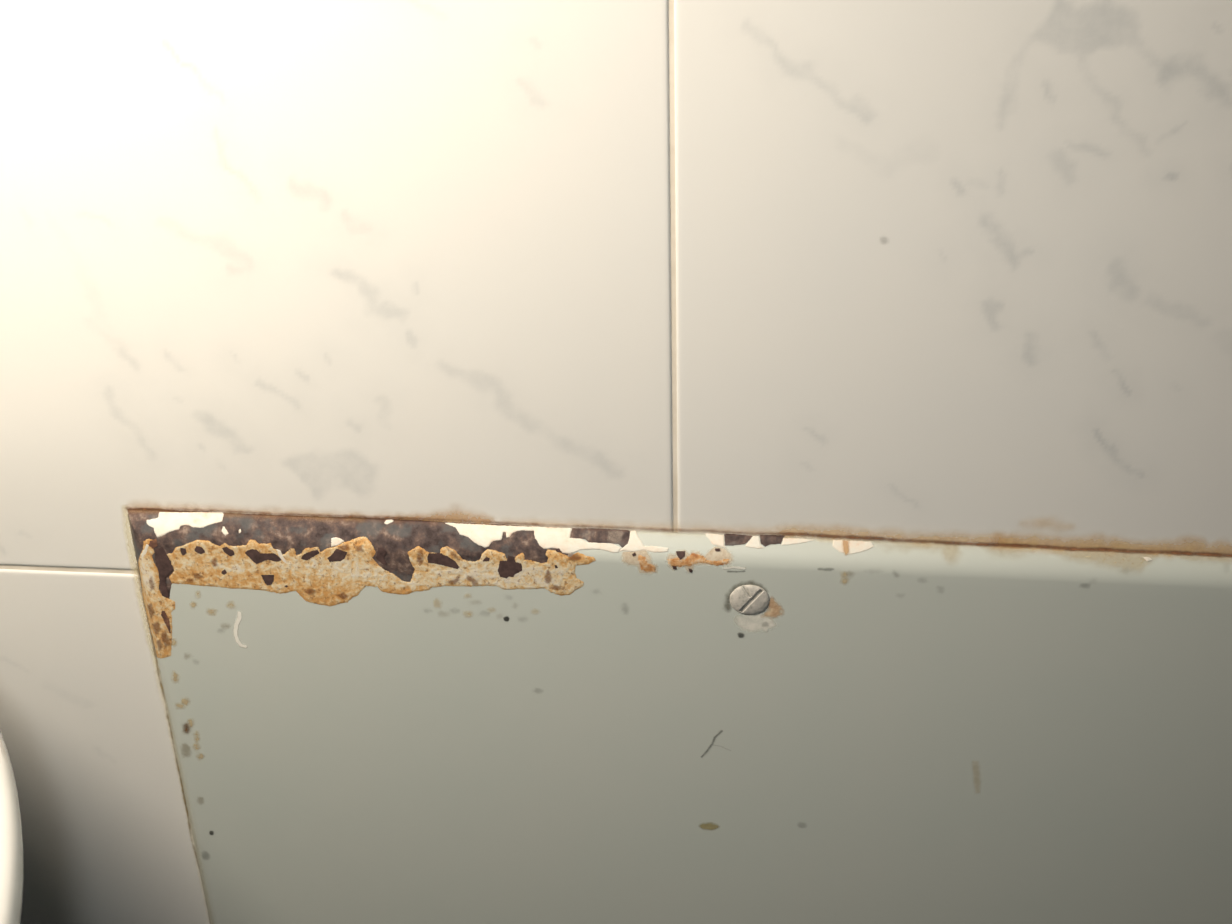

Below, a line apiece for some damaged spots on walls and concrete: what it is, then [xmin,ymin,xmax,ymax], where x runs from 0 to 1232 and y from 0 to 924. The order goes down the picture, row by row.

peeling [571,528,669,553]
peeling [705,533,813,549]
corrosion [779,530,1232,561]
corrosion [127,508,731,696]